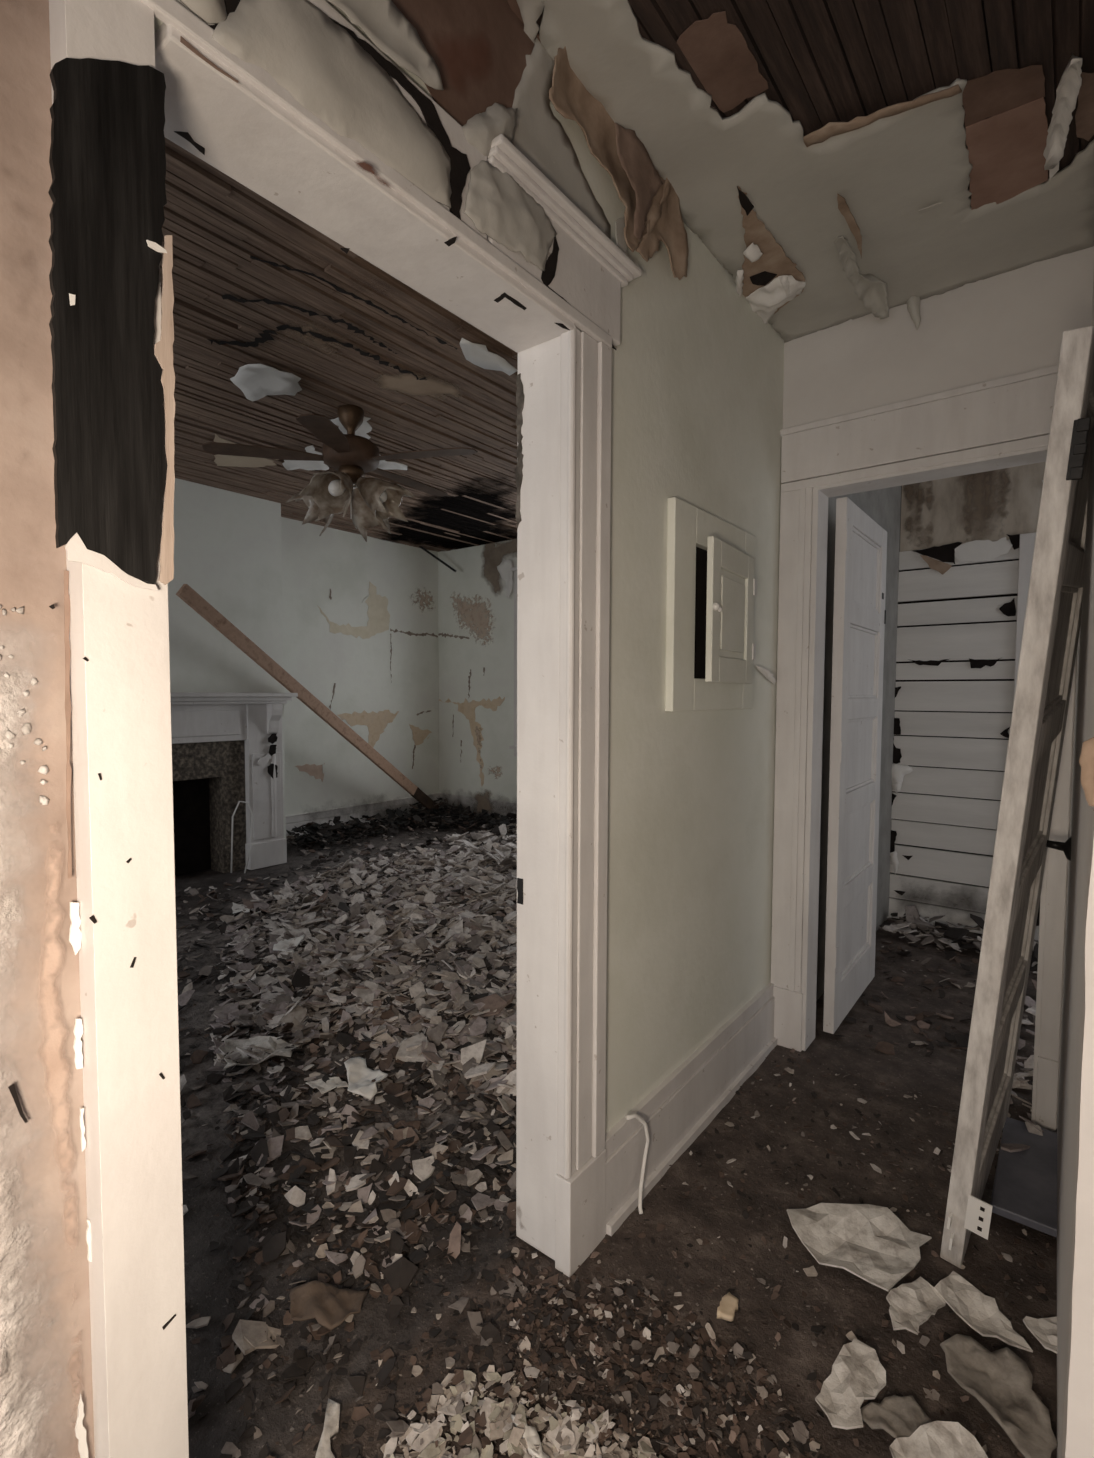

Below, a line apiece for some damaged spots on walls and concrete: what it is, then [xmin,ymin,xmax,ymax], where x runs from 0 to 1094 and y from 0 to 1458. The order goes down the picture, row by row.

flaking render [391,0,541,126]
flaking render [677,11,768,113]
peeling [174,131,205,155]
flaking render [963,65,1048,210]
peeling [146,240,167,253]
peeling [494,292,527,310]
damp [963,468,1010,533]
peeling [0,533,158,1458]